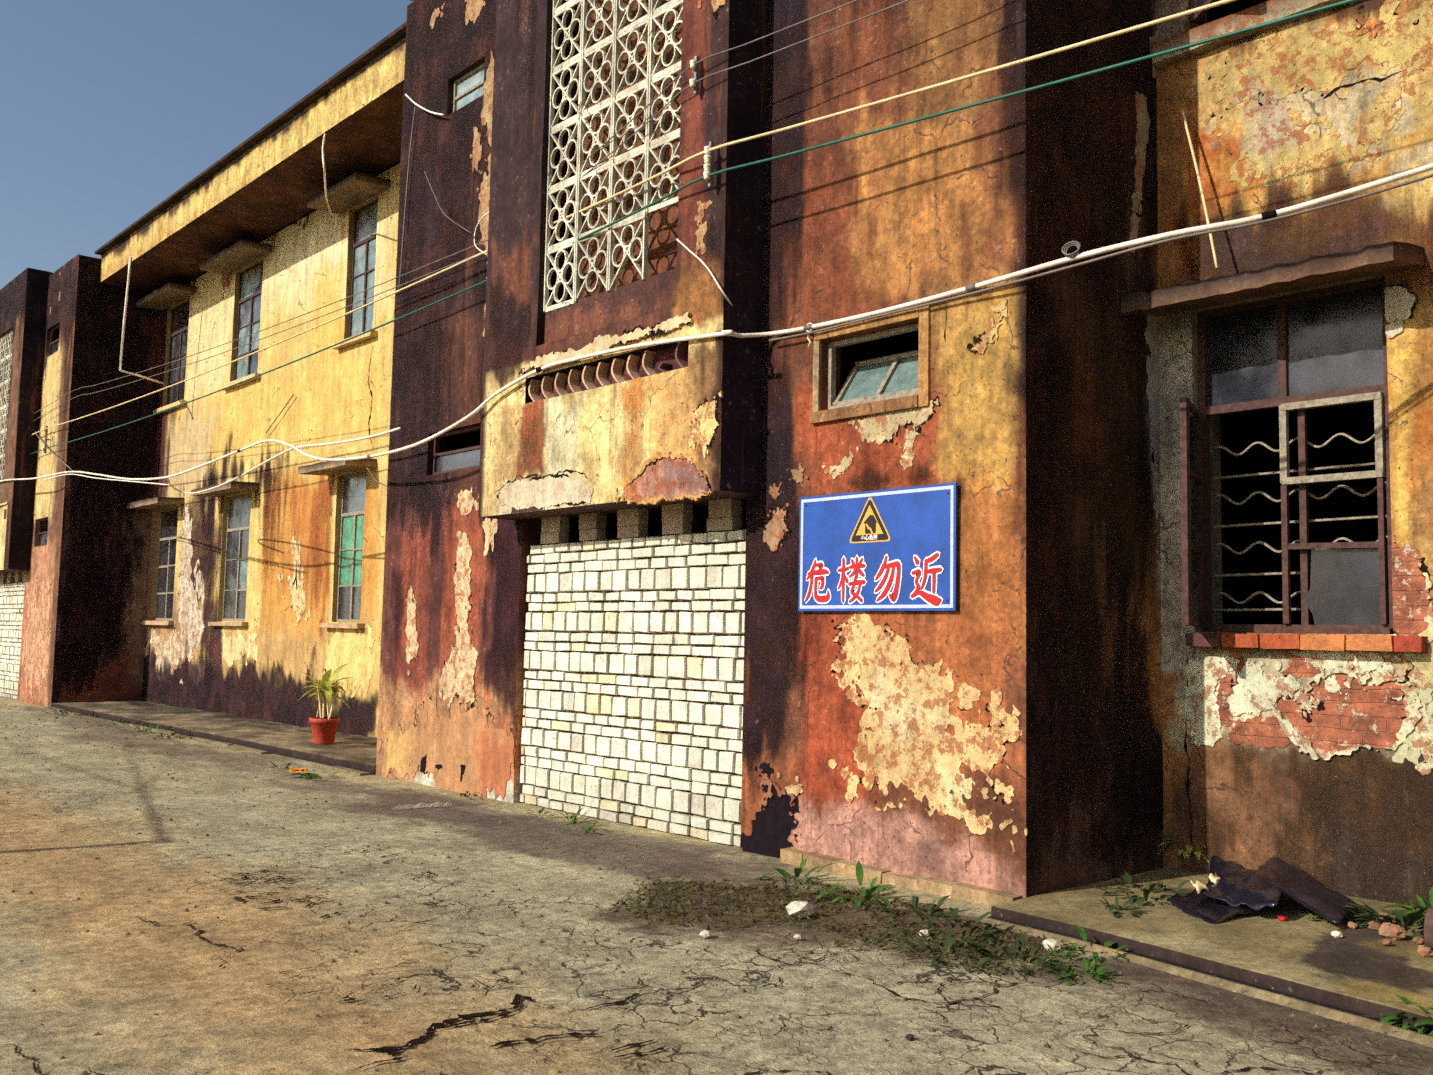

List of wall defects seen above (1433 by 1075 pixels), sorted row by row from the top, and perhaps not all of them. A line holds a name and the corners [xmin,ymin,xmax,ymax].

peeling [144,504,258,684]
water stain [43,257,378,736]
water stain [386,0,545,554]
peeling [375,473,594,799]
water stain [742,0,812,781]
peeling [828,611,1028,853]
water stain [997,0,1164,878]
spalling [1183,535,1433,775]
crack [137,916,240,969]
crack [350,993,666,1068]
crack [755,948,1066,1025]
crack [1073,1023,1338,1075]